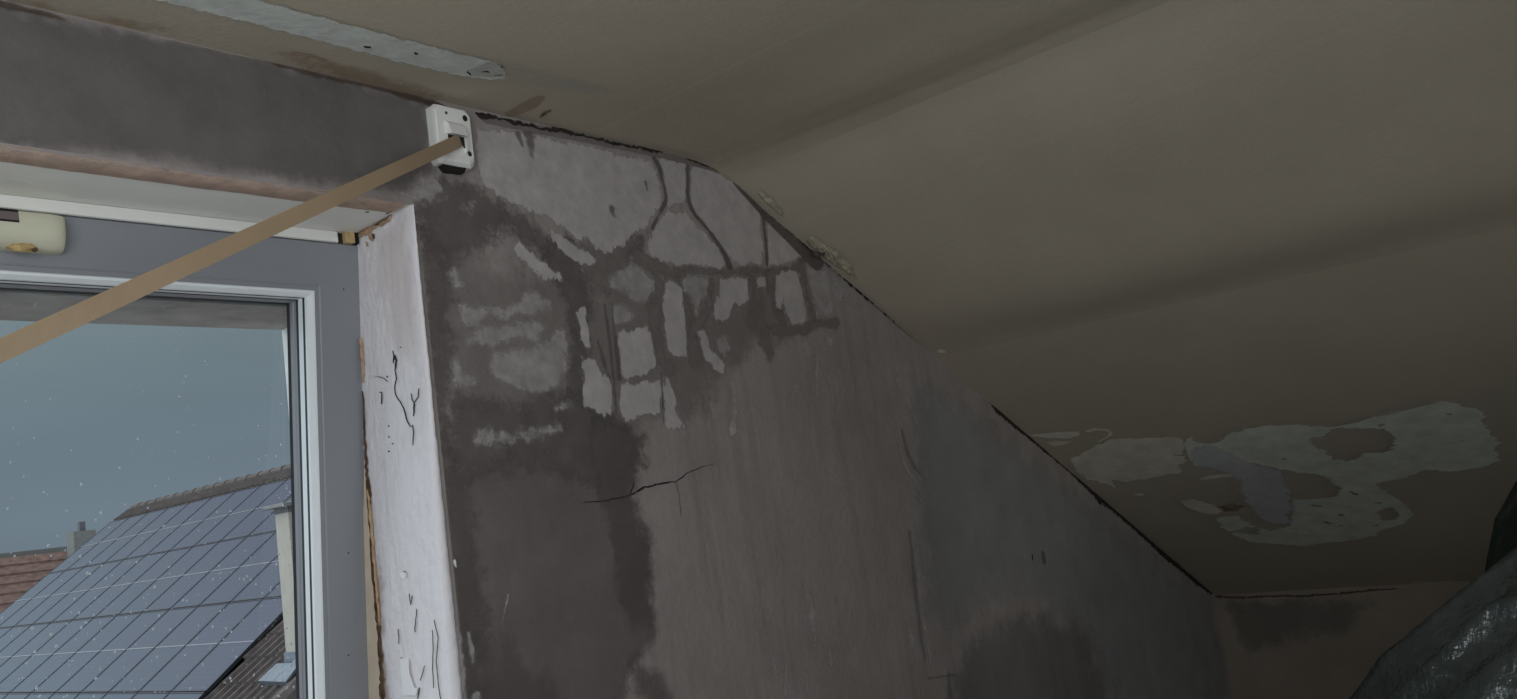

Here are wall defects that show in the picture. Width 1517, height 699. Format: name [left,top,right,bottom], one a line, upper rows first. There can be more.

crack [475,110,929,351]
crack [360,338,441,699]
damp [0,7,851,699]
crack [583,464,712,516]
crack [991,404,1399,599]
peeling [1028,400,1501,546]